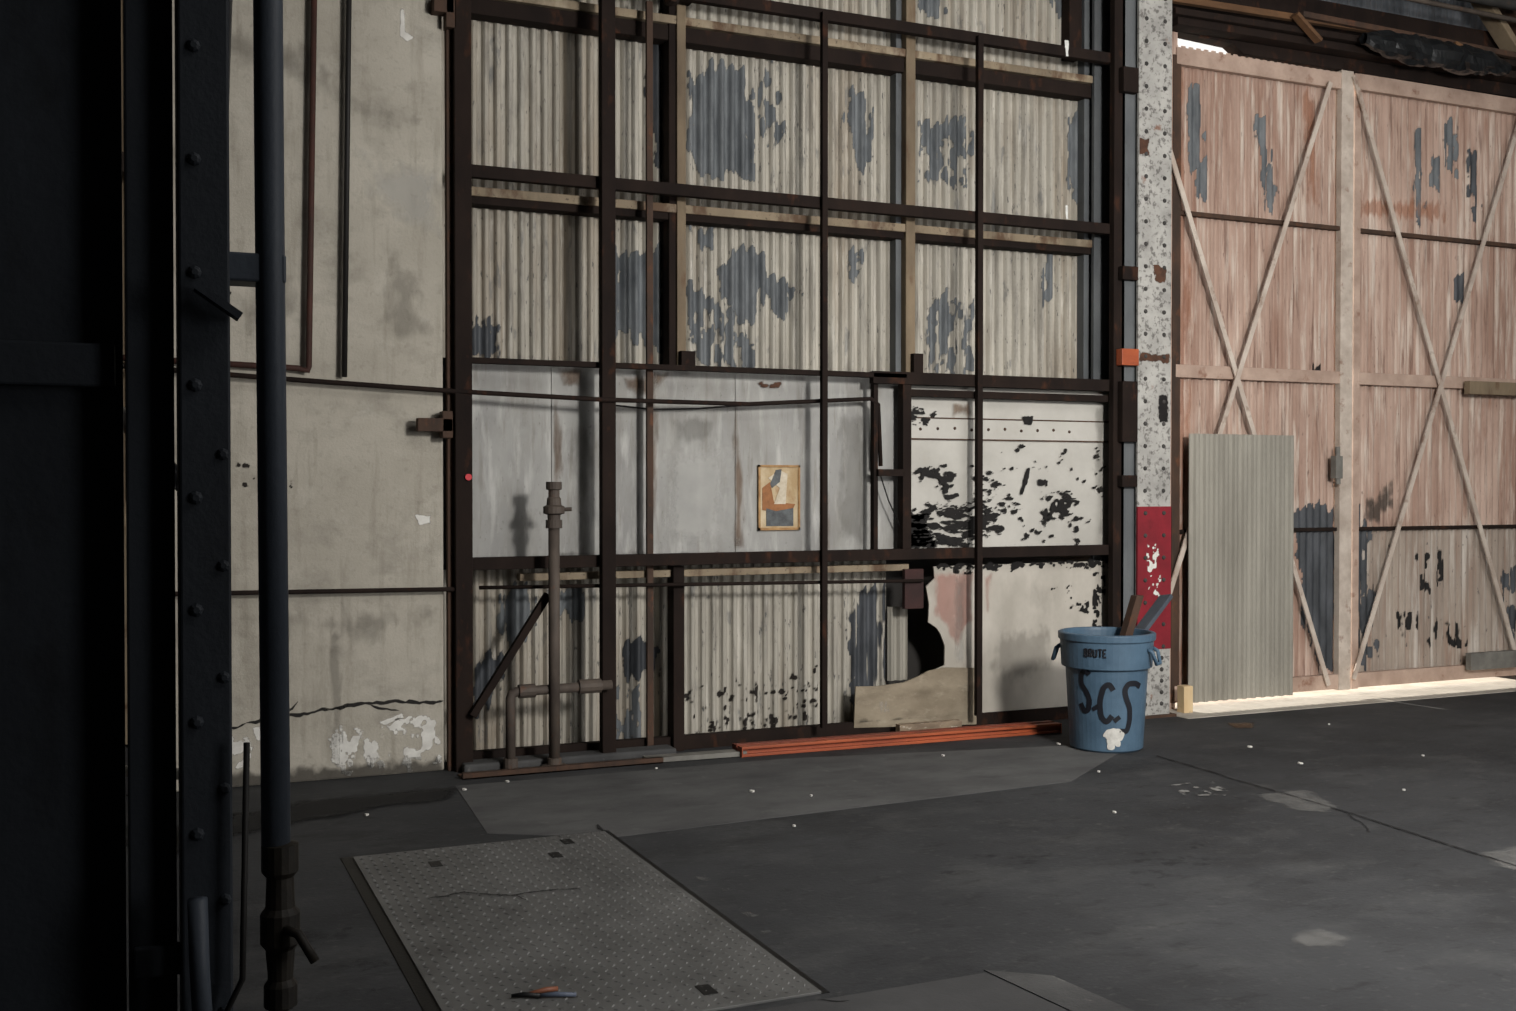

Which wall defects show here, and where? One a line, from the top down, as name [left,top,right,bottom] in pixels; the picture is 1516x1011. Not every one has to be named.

peeling [911,406,937,426]
peeling [911,444,1108,574]
peeling [1146,544,1161,596]
crack [232,699,443,729]
flaking render [232,727,260,769]
flaking render [328,713,442,775]